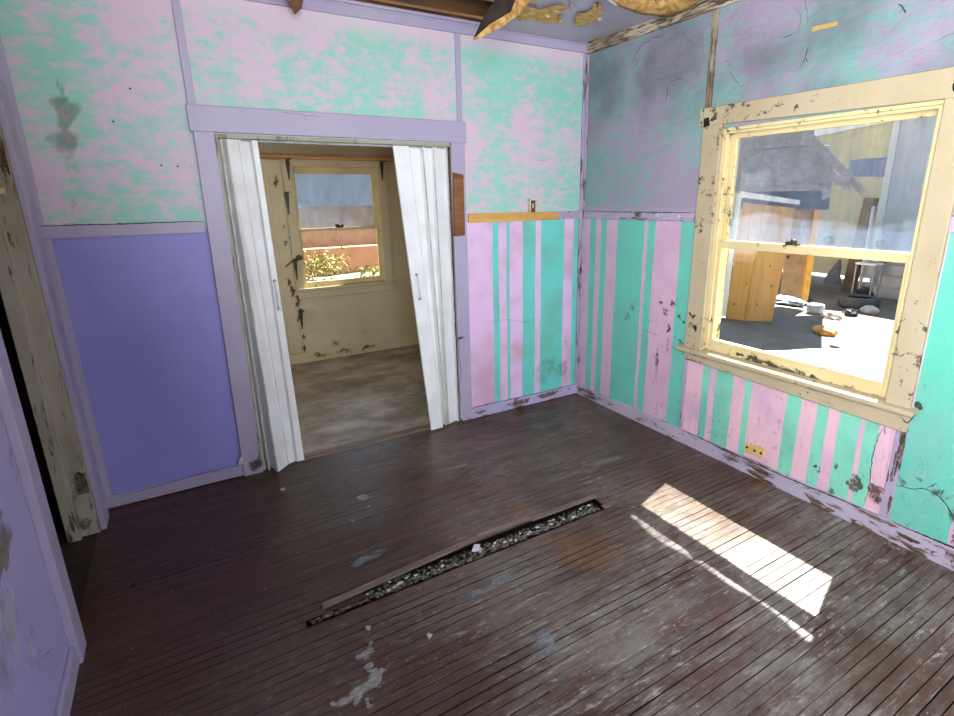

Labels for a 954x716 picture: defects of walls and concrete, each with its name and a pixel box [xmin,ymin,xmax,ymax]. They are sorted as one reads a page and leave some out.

peeling [516,0,603,27]
crack [683,416,954,549]
peeling [805,493,877,534]
damp [0,527,11,576]
peeling [895,531,954,568]